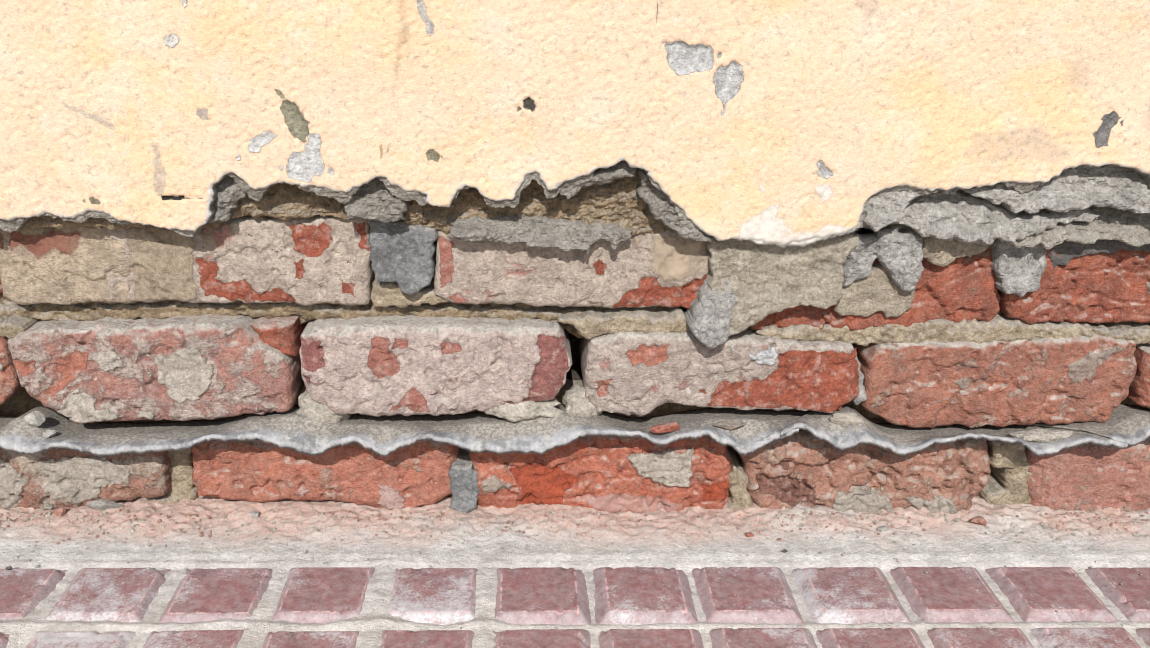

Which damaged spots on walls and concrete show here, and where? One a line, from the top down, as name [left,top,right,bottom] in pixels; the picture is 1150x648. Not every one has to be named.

peeling [663,40,744,115]
flaking render [517,97,535,111]
peeling [1094,111,1124,148]
spalling [172,89,361,303]
flaking render [376,177,428,206]
flaking render [447,171,595,208]
flaking render [1001,181,1043,194]
flaking render [0,197,131,232]
peeling [739,185,941,245]
spalling [354,223,370,250]
spalling [593,260,607,275]
spalling [613,274,708,308]